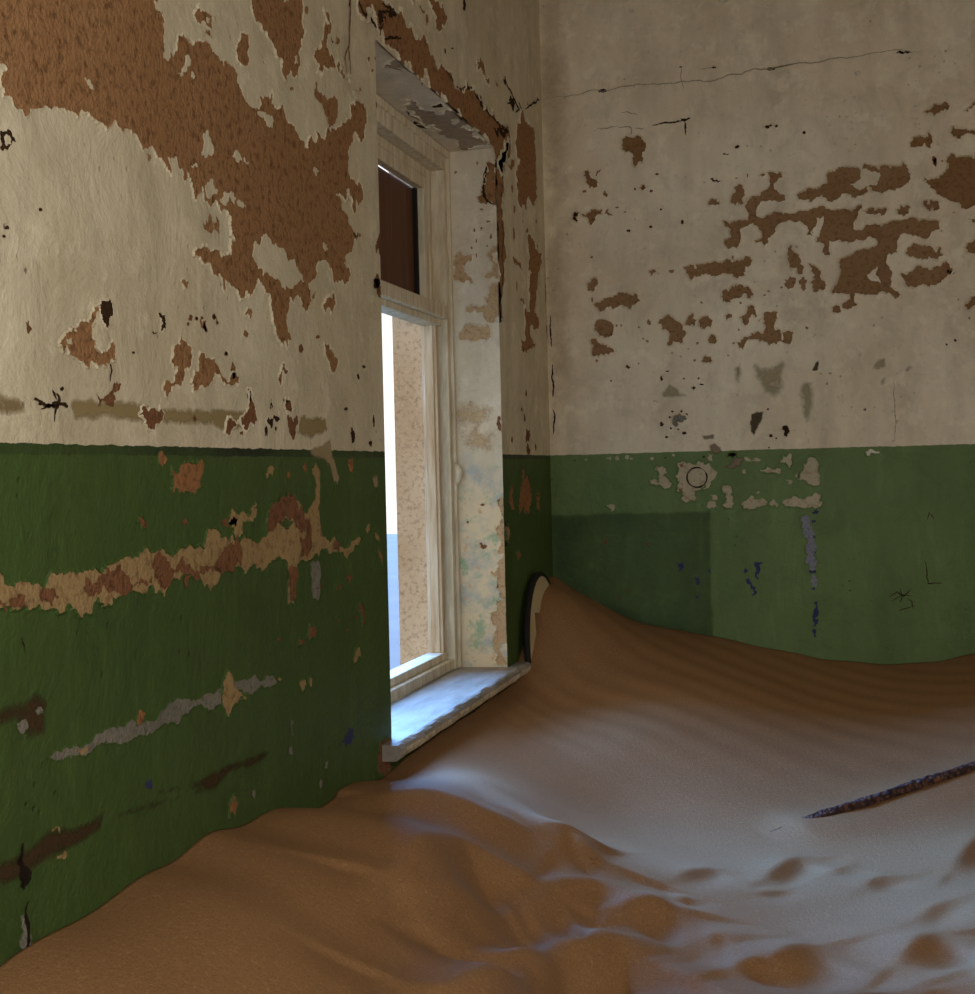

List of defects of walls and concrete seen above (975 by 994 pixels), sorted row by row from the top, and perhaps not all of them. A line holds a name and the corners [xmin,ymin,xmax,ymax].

peeling [0,0,377,440]
flaking render [356,0,548,356]
peeling [571,207,626,227]
peeling [620,134,648,169]
crack [446,49,911,321]
peeling [638,130,975,365]
peeling [922,100,952,118]
peeling [949,125,975,141]
peeling [586,276,642,362]
peeling [157,448,206,496]
peeling [0,461,384,620]
peeling [648,451,825,590]